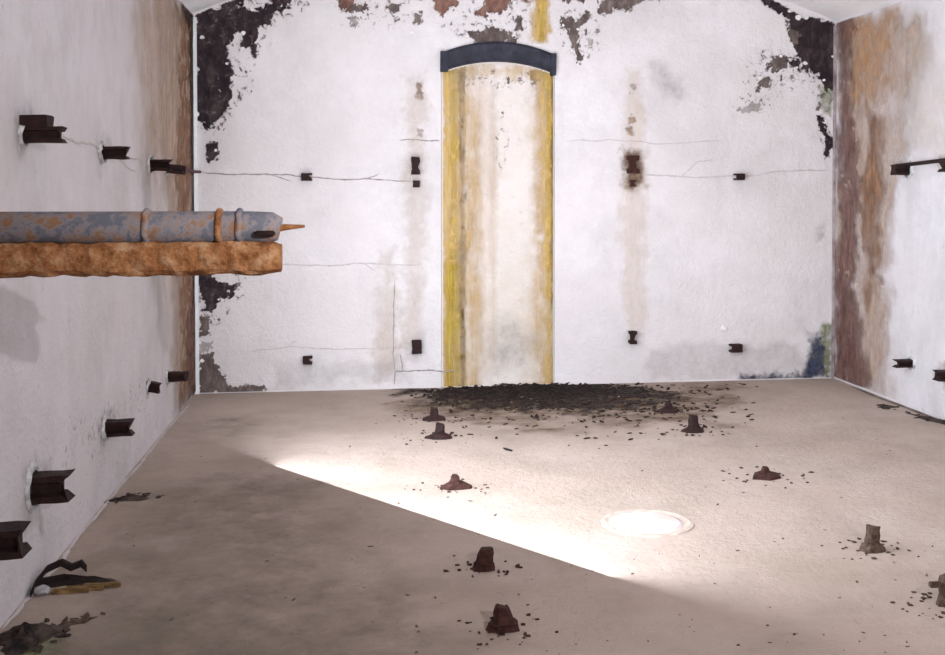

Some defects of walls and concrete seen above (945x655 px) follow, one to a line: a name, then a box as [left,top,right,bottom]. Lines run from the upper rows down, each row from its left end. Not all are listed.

peeling [195,0,309,163]
peeling [330,0,542,43]
peeling [560,0,663,65]
peeling [737,0,835,163]
corrosion [624,152,642,189]
peeling [199,274,267,393]